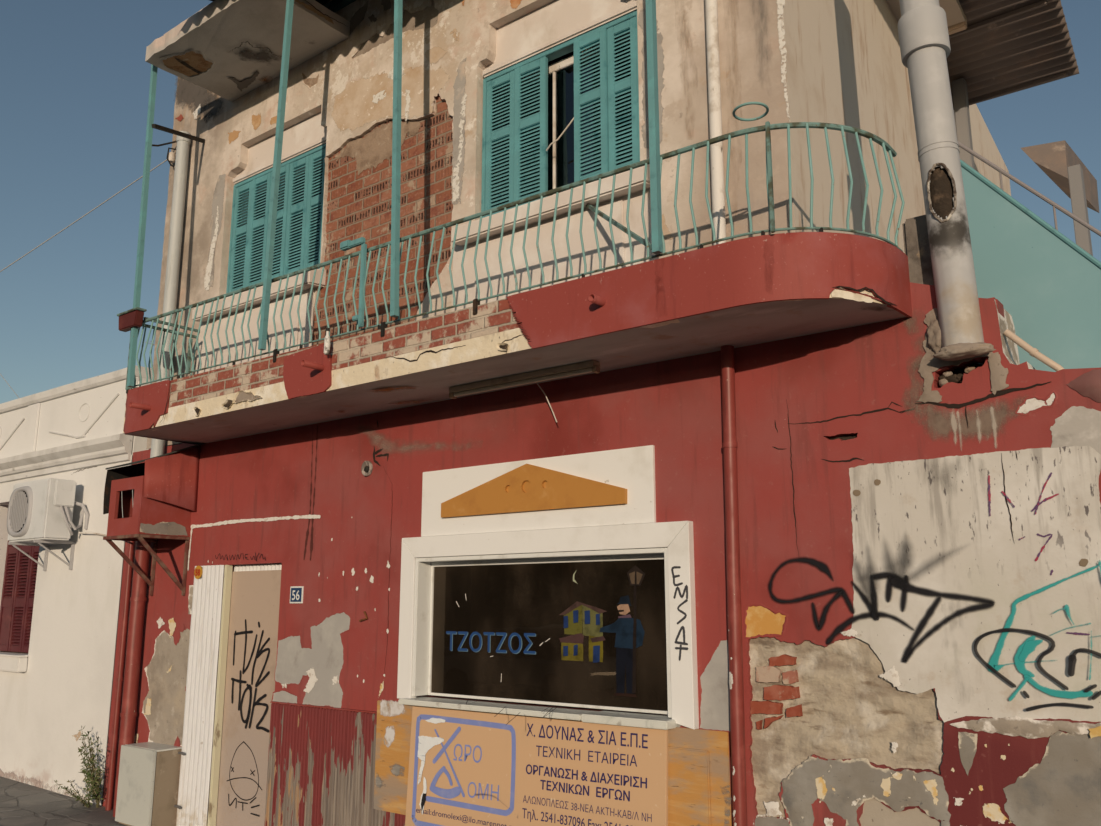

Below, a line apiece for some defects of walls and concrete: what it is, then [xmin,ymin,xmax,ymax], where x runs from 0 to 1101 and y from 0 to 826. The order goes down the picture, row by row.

spalling [160,49,214,77]
damp [175,77,222,121]
peeling [638,8,665,148]
flaking render [313,0,467,345]
peeling [204,174,226,290]
crack [831,286,897,306]
hole [938,363,984,387]
crack [773,381,1052,553]
peeling [134,584,194,747]
peeling [272,611,351,708]
peeling [698,630,733,733]
peeling [744,390,1101,826]